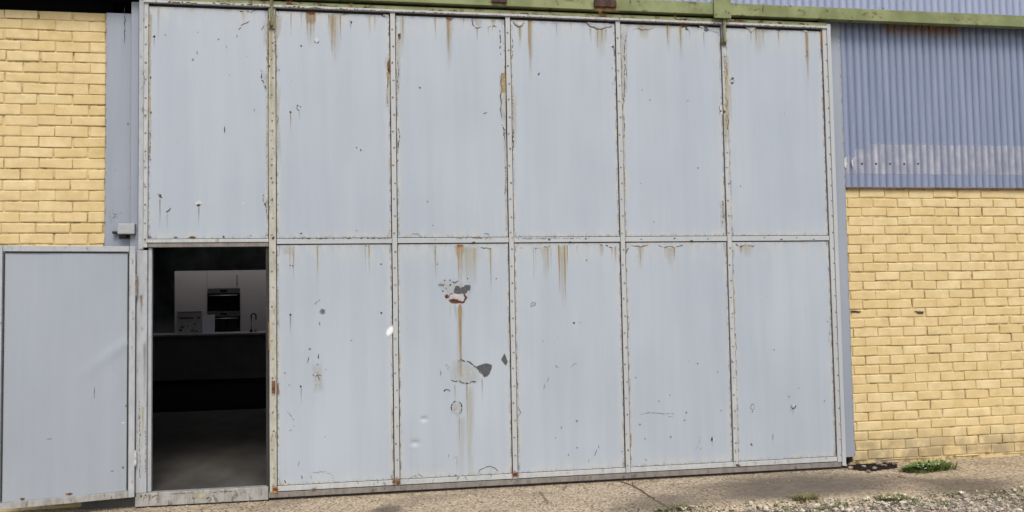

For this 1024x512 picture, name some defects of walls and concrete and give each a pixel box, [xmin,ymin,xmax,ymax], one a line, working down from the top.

peeling [438,278,471,303]
peeling [440,353,508,414]